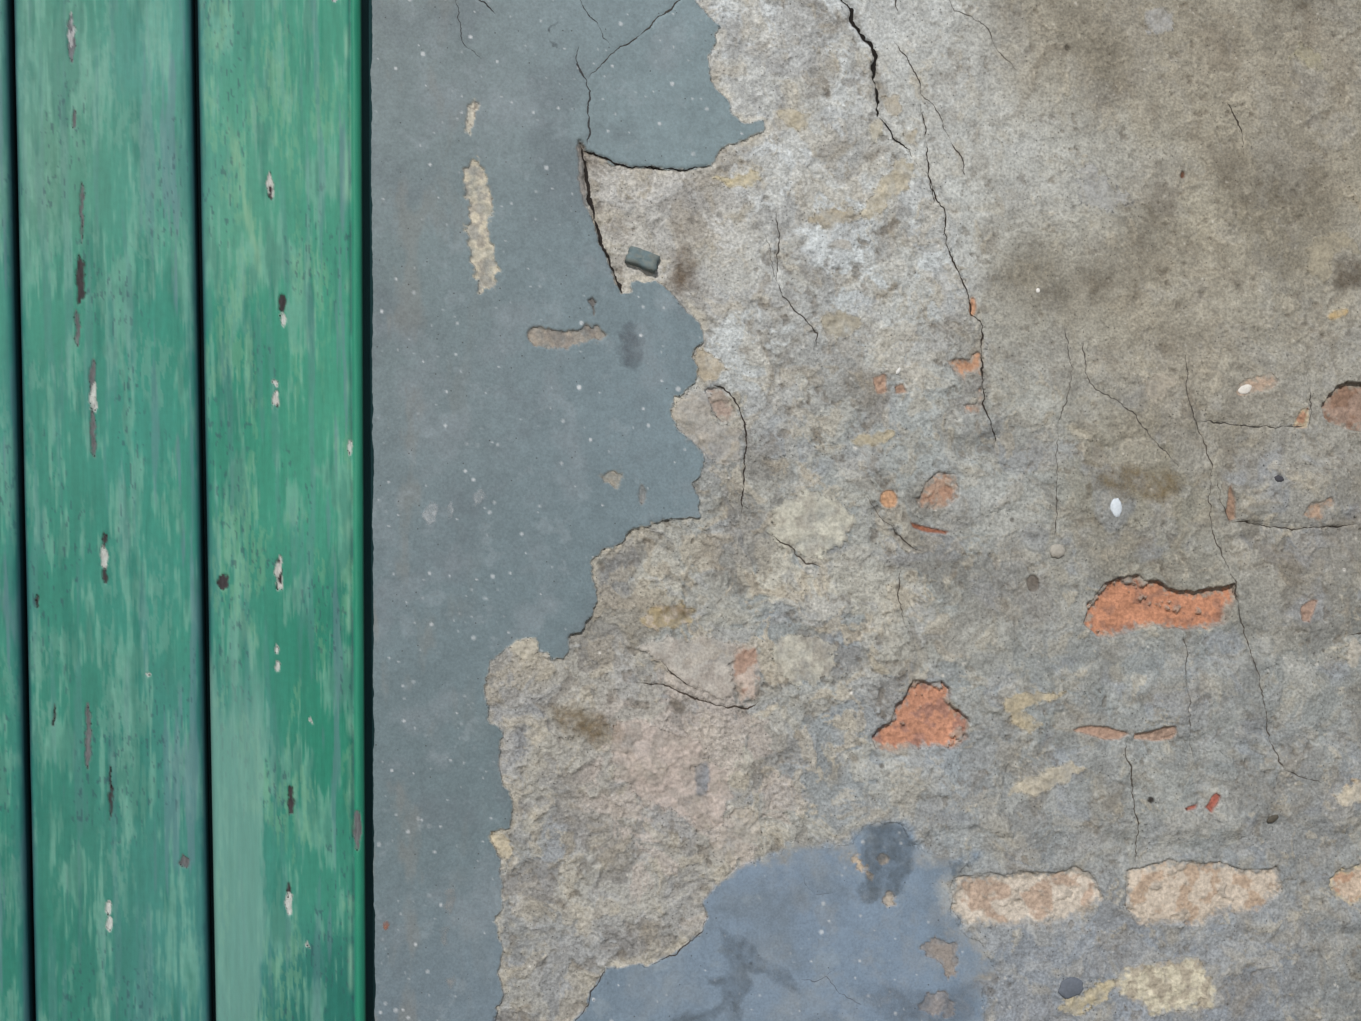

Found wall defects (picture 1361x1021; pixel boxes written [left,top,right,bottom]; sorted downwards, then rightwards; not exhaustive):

crack [456,0,494,56]
crack [949,0,1014,68]
crack [576,0,708,293]
peeling [463,160,499,294]
crack [841,0,996,441]
flaking render [1294,382,1361,431]
peeling [484,0,989,1021]
flaking render [1083,575,1236,638]